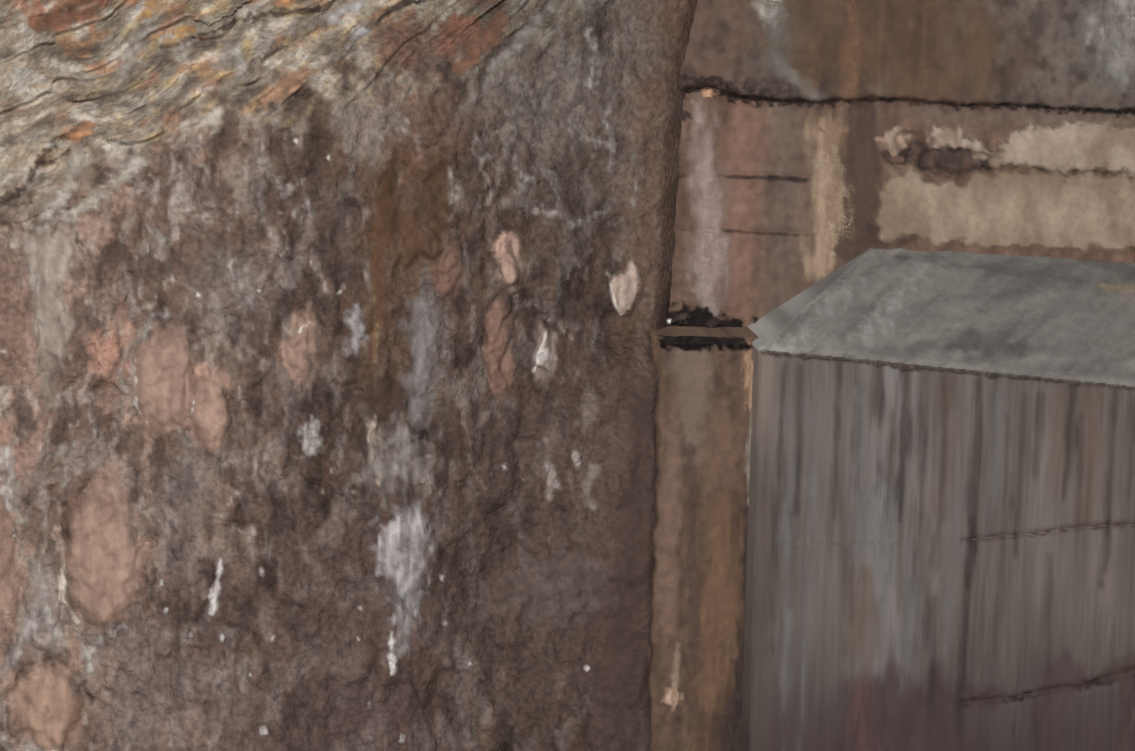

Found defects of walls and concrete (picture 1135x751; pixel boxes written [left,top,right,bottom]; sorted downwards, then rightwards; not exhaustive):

efflorescence [757,0,799,86]
efflorescence [1087,0,1135,82]
crack [676,74,1135,121]
peeling [875,119,1135,253]
crack [964,523,1135,541]